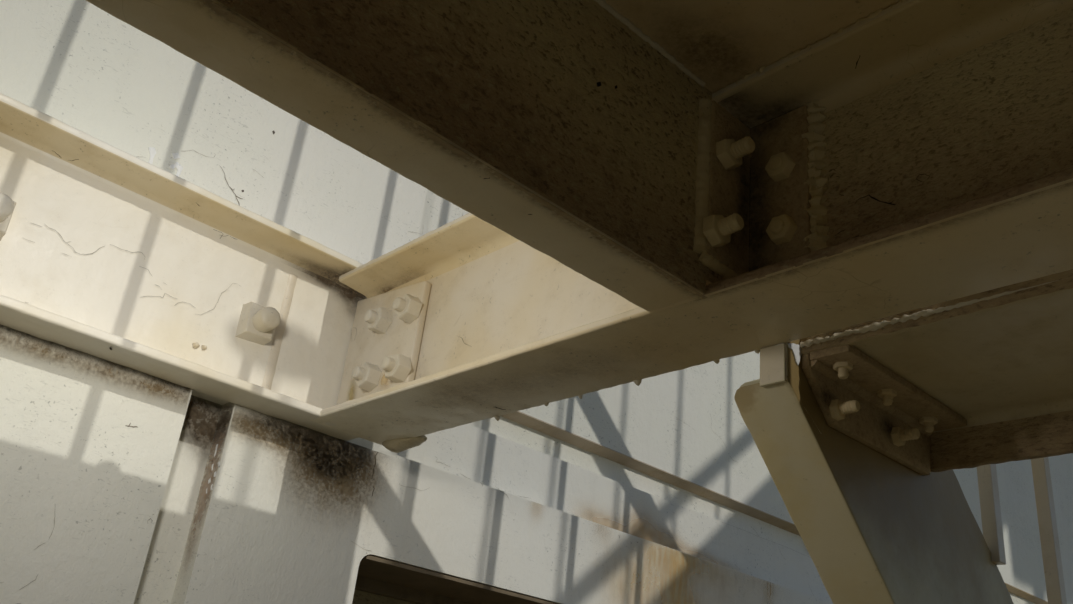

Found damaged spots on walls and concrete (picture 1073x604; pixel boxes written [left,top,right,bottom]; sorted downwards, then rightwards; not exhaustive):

crack [24,223,240,315]
damp [259,416,373,483]
rust [649,548,703,604]